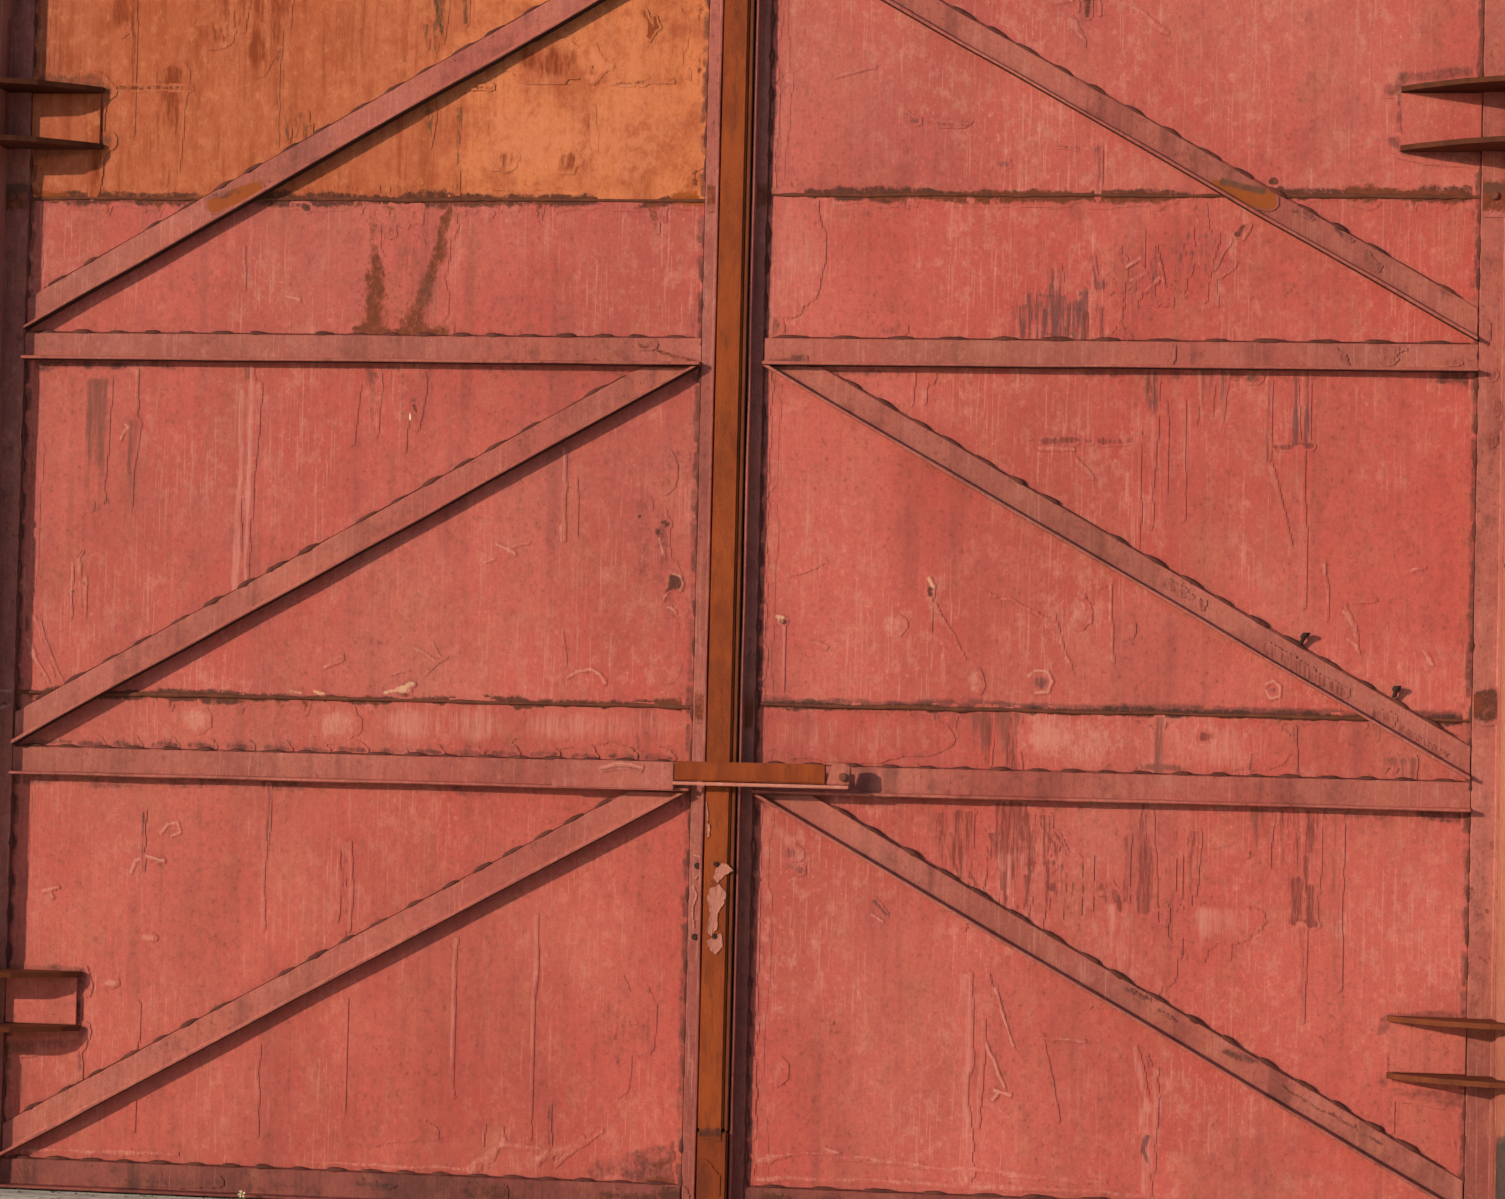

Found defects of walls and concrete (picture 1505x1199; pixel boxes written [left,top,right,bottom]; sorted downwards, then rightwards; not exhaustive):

rust [32,0,612,336]
rust [634,186,704,236]
peeling [690,854,733,954]